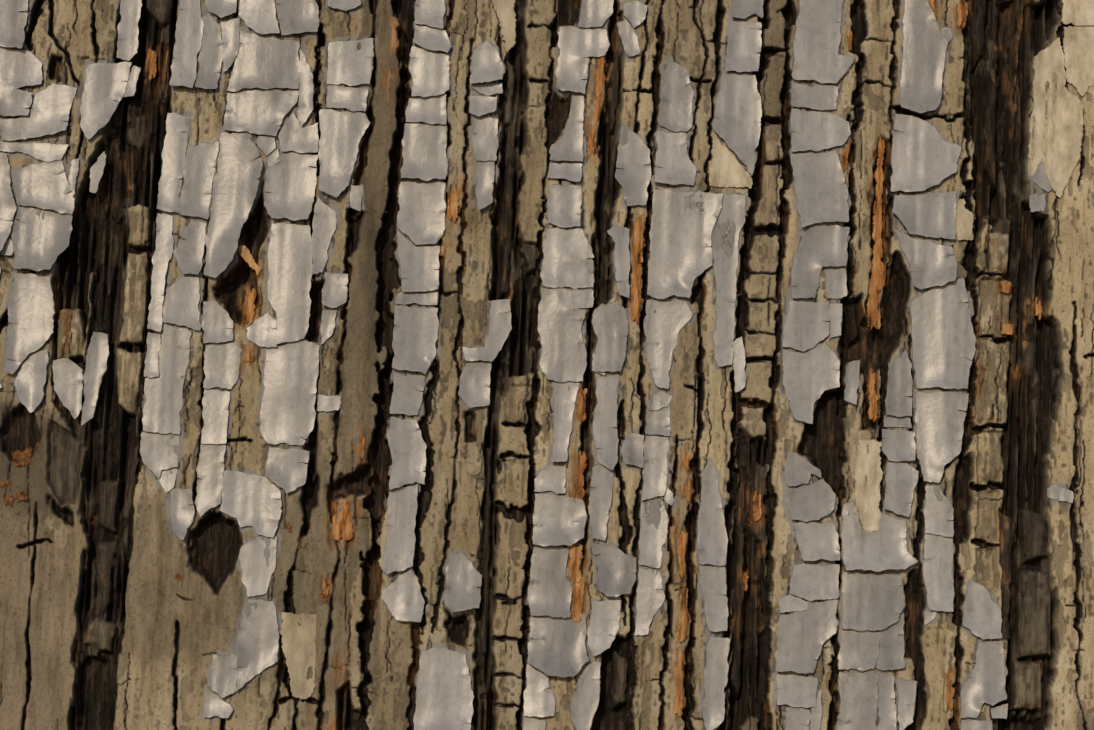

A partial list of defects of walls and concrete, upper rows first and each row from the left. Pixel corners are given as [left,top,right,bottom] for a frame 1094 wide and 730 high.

crack [0,313,9,333]
peeling [0,0,142,426]
peeling [140,0,374,718]
peeling [378,0,452,622]
peeling [458,299,512,408]
peeling [469,0,517,210]
peeling [522,0,764,730]
crack [615,0,797,730]
peeling [774,0,1008,730]
crack [18,504,53,730]
peeling [413,647,474,730]
peeling [444,553,482,612]